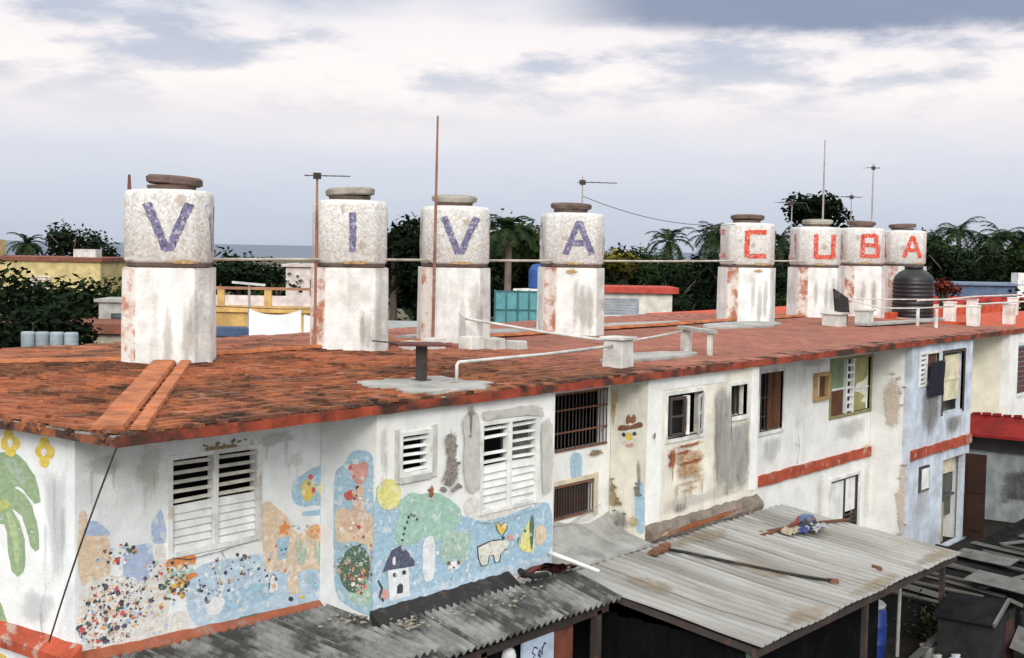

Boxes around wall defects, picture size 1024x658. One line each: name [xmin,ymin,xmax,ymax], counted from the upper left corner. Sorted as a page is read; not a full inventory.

peeling [428,405,554,497]
peeling [676,396,750,504]
water stain [717,388,727,451]
peeling [883,372,908,430]